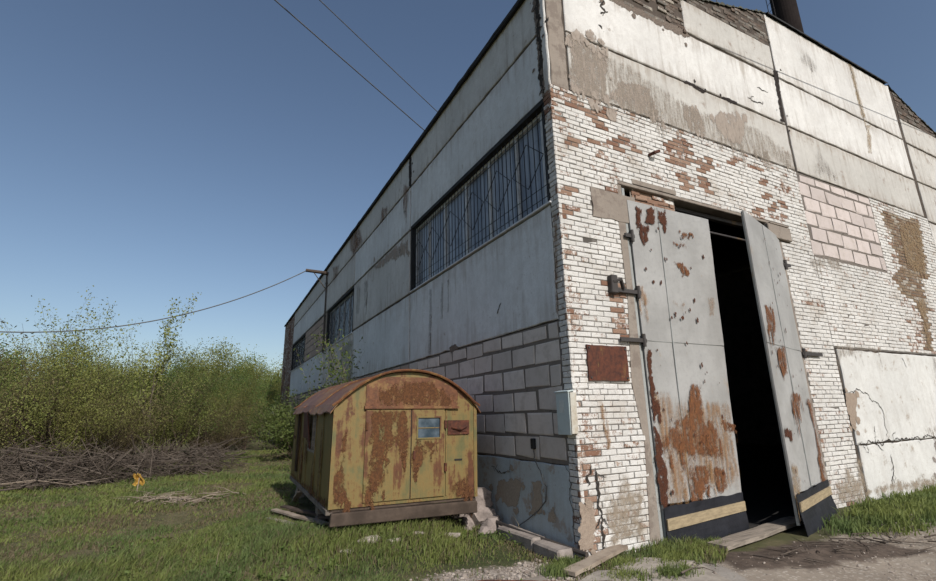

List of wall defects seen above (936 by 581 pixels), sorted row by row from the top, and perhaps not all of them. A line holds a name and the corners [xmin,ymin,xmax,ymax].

spalling [530,0,549,97]
spalling [600,0,690,47]
peeling [557,29,748,195]
flaking render [555,186,580,219]
flaking render [726,158,788,222]
flaking render [880,211,934,351]
corrosion [290,420,351,512]
corrosion [365,381,452,510]
crack [564,465,608,549]
corrosion [647,349,737,510]
corrosion [764,295,826,481]
crack [847,388,936,483]